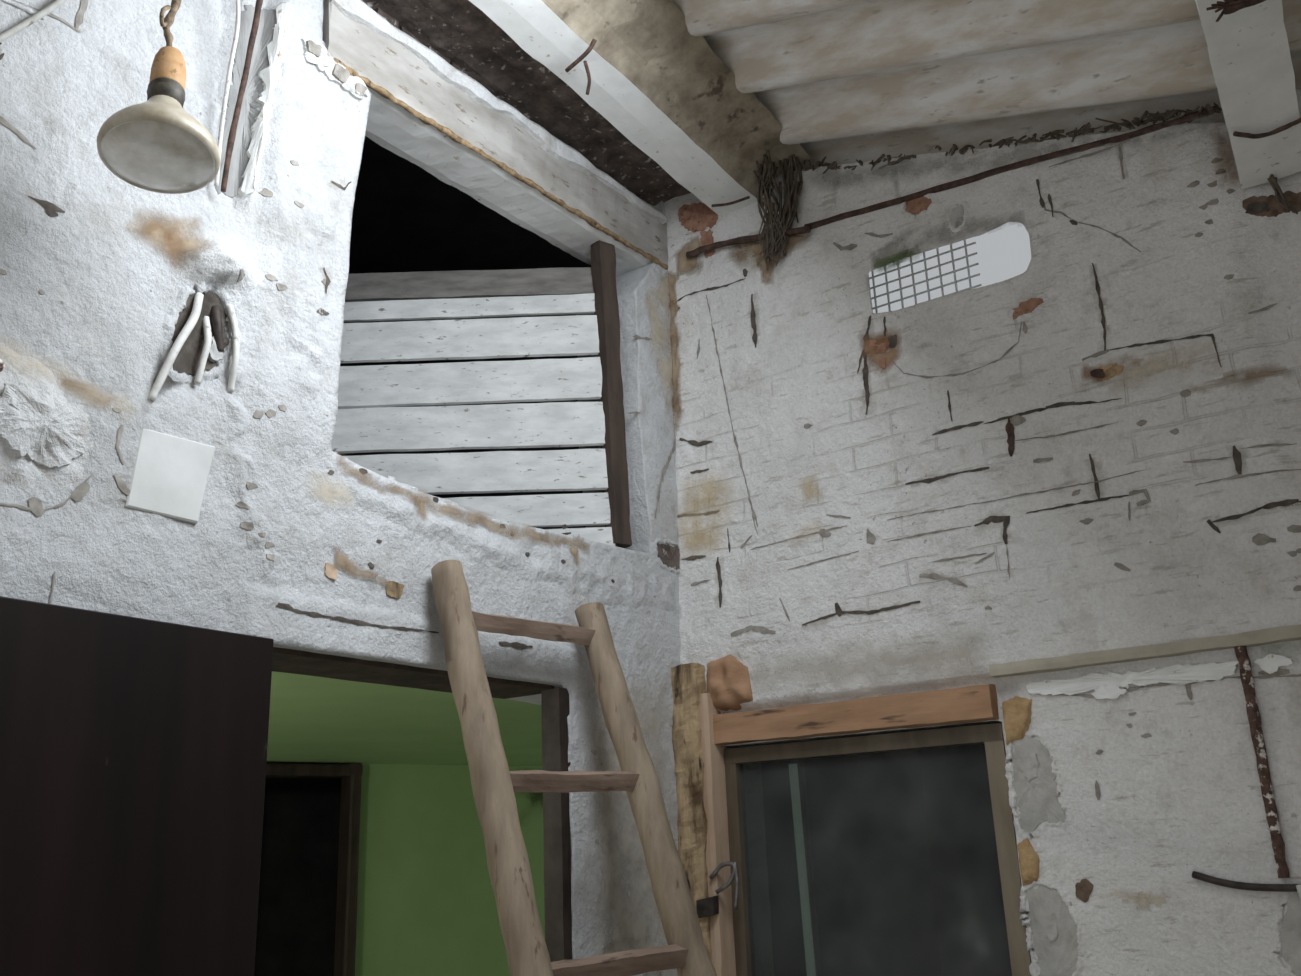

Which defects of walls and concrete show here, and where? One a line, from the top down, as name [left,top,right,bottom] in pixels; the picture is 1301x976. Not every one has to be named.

crack [1036,142,1141,253]
spalling [1004,292,1050,324]
crack [1082,263,1222,367]
crack [1249,303,1278,314]
crack [655,269,1151,637]
crack [1183,443,1301,545]
spalling [385,581,404,599]
spalling [1005,730,1071,840]
spalling [1019,877,1093,976]
spalling [1271,892,1301,976]